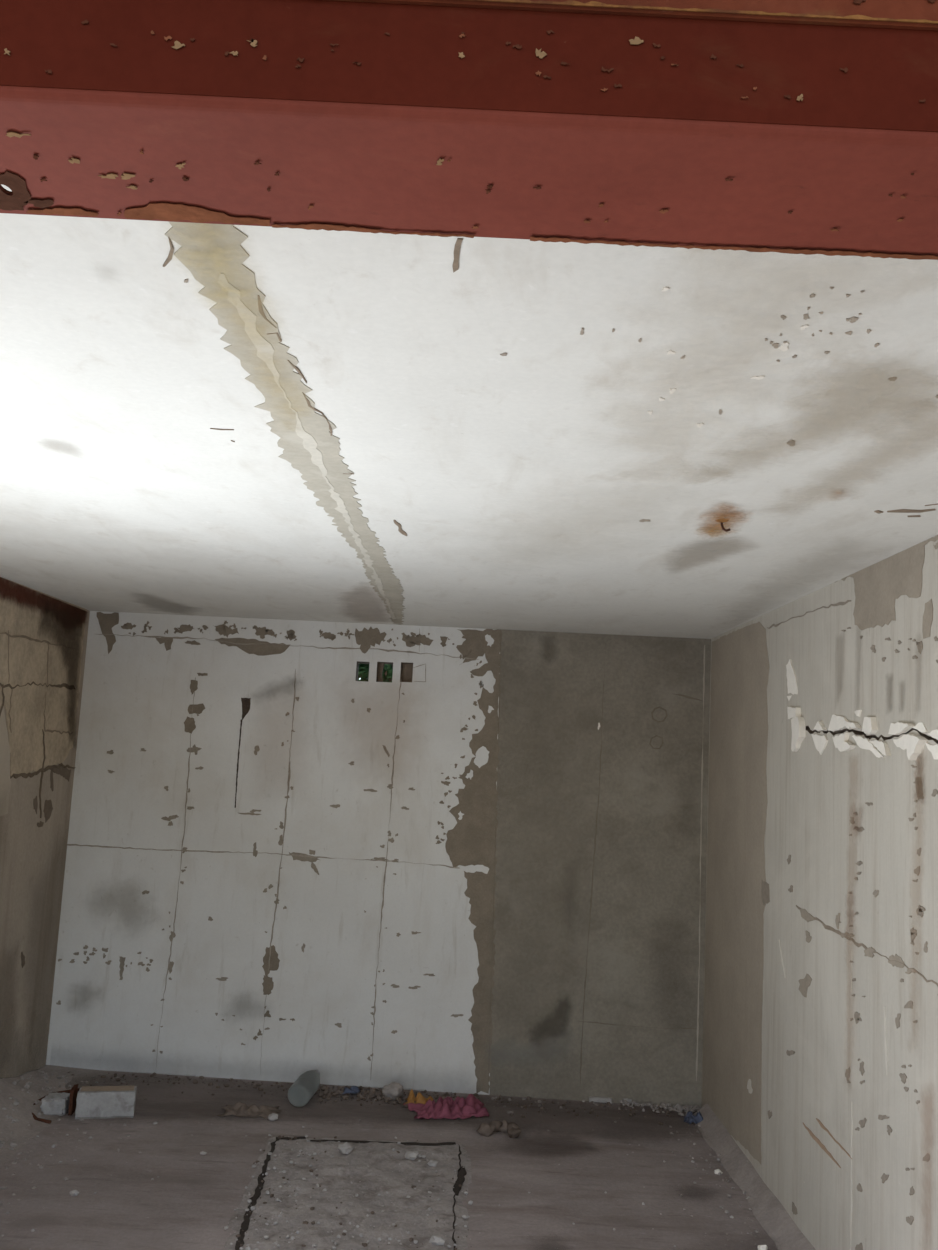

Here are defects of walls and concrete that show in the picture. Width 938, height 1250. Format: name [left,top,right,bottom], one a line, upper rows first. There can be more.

rust [706,514,739,535]
crack [0,630,76,818]
spalling [0,580,297,827]
peeling [161,221,502,1093]
crack [786,659,938,761]
peeling [841,541,938,662]
crack [796,905,938,986]
crack [235,1136,467,1250]